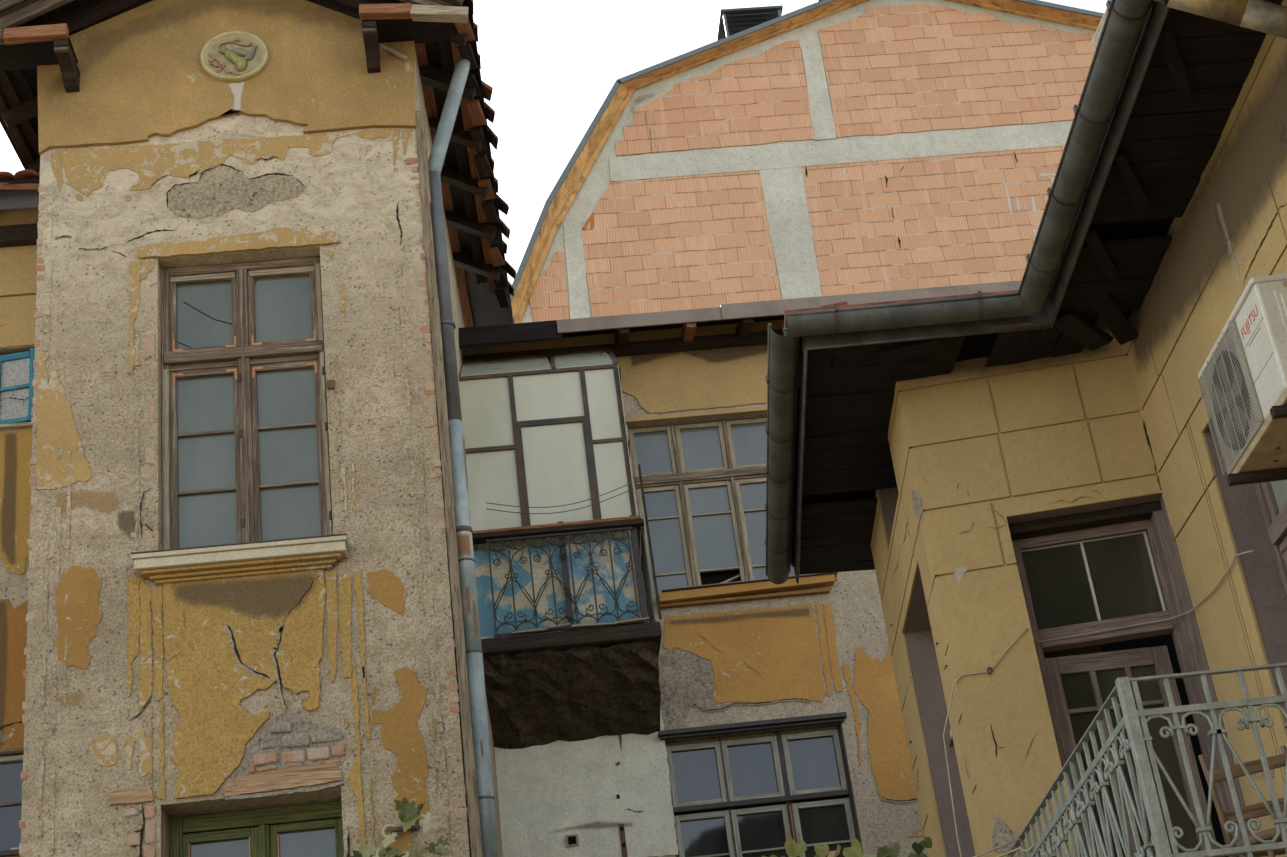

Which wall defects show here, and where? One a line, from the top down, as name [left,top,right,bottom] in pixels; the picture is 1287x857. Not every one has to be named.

flaking render [0,128,421,579]
spalling [419,236,448,550]
flaking render [53,565,102,669]
crack [223,576,320,710]
flaking render [88,569,460,856]
flaking render [494,603,917,857]